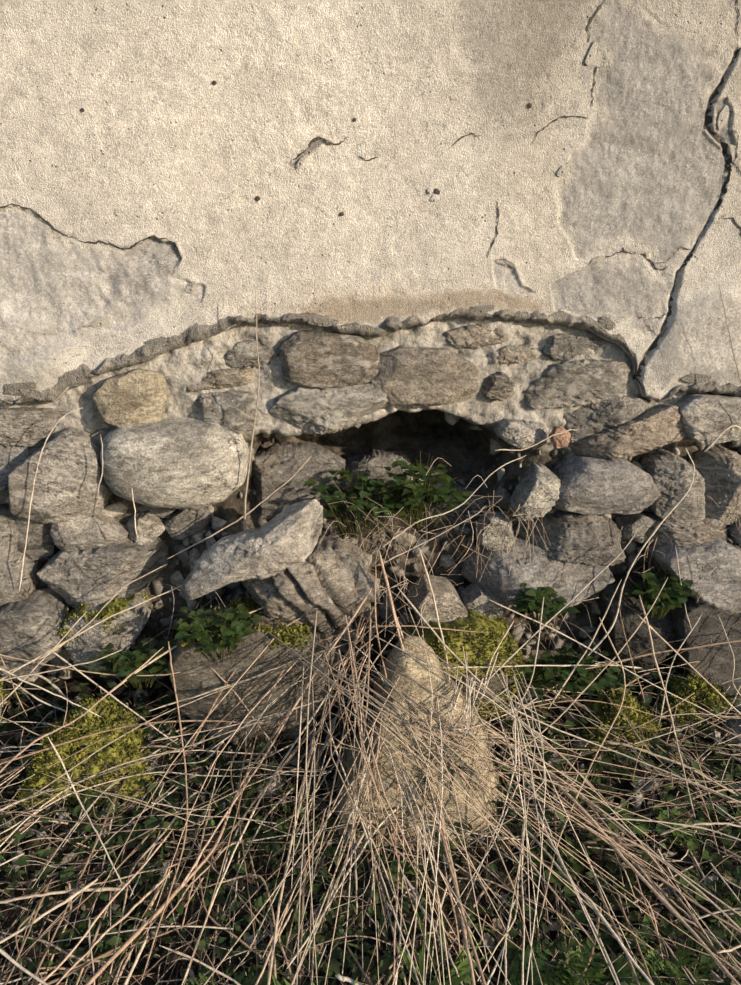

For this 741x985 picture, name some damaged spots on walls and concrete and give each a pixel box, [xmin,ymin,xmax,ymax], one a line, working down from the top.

crack [288,137,377,166]
flaking render [557,13,736,261]
crack [595,0,741,380]
flaking render [0,214,180,361]
flaking render [0,256,741,404]